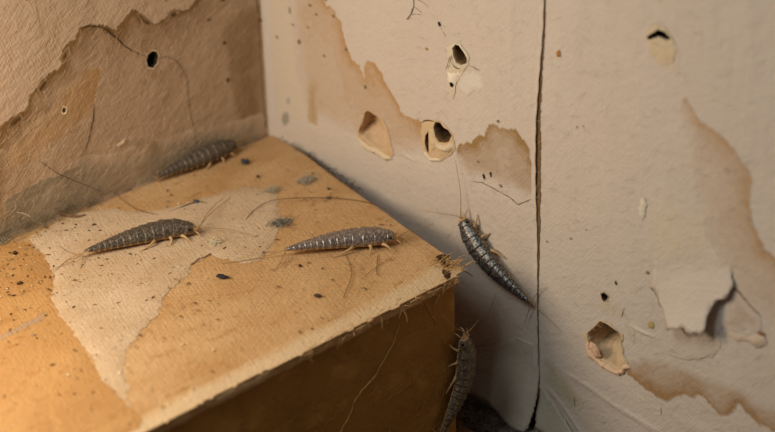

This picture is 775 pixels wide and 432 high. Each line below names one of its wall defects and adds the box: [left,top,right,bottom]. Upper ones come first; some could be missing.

hole [146,49,160,70]
spalling [446,43,484,99]
spalling [646,24,676,65]
spalling [357,110,394,161]
spalling [421,119,455,162]
water stain [0,0,537,349]
crack [469,0,545,361]
water stain [680,97,775,328]
spalling [582,320,631,376]
crack [528,382,539,430]
water stain [626,356,775,432]